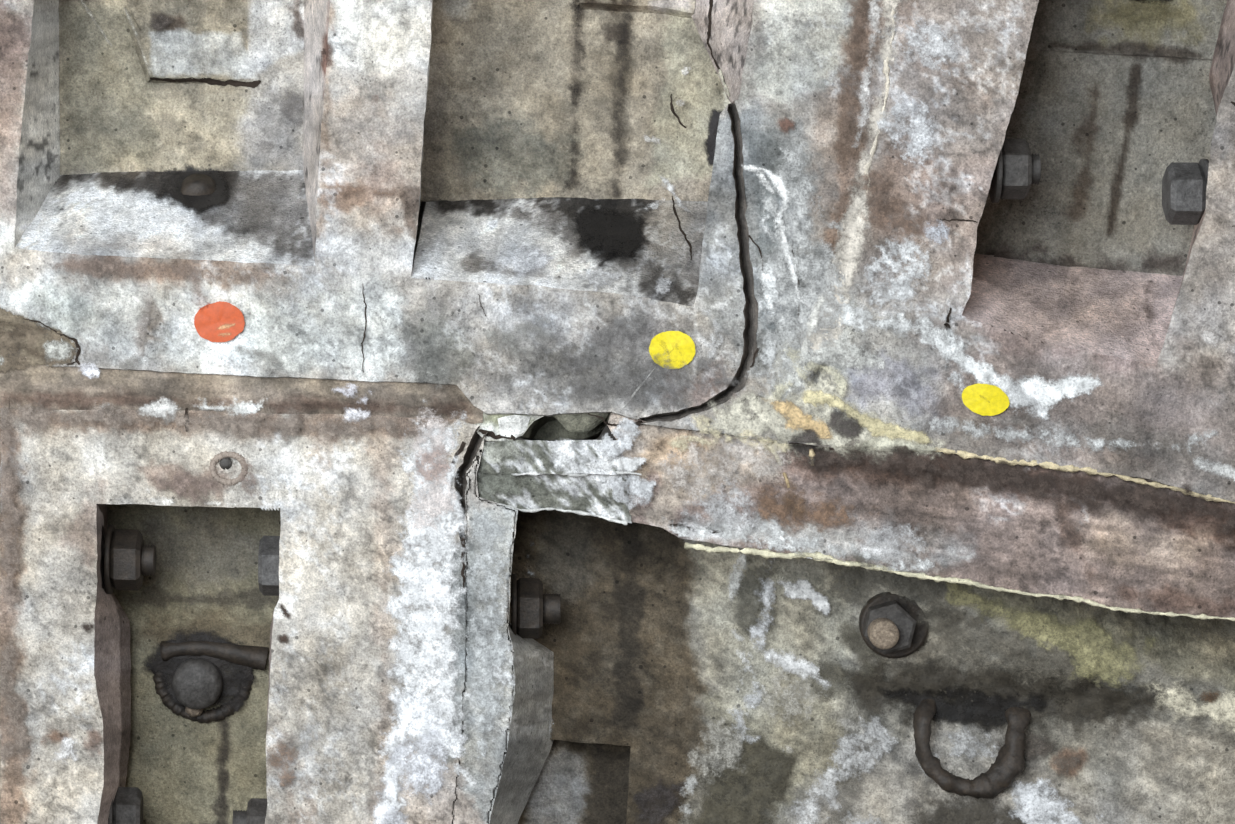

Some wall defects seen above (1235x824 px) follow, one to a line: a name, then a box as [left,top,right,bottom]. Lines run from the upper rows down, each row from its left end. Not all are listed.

crack [150,77,261,88]
crack [588,0,764,426]
crack [791,240,800,324]
crack [451,426,516,588]
spalling [477,412,656,525]